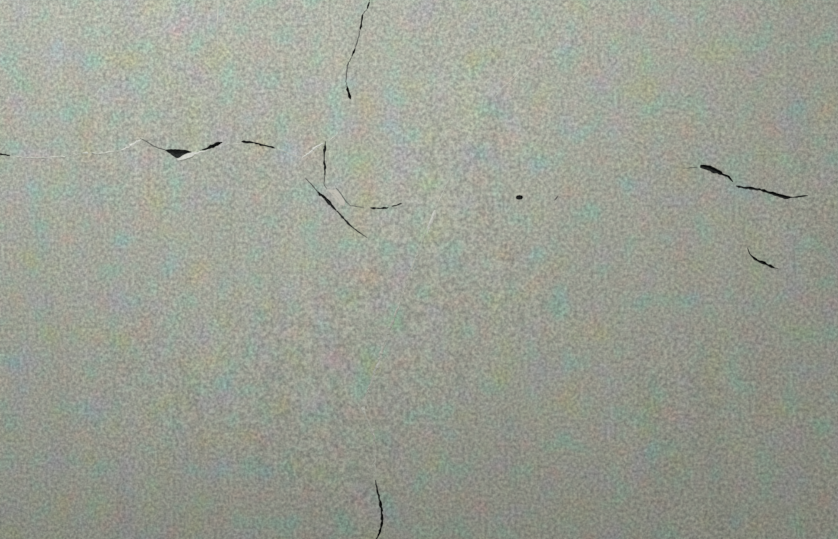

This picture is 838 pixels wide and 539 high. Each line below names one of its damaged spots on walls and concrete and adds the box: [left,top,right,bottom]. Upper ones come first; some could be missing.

crack [345,0,370,99]
crack [0,138,165,159]
crack [683,165,808,199]
crack [747,248,778,269]
crack [361,172,453,539]